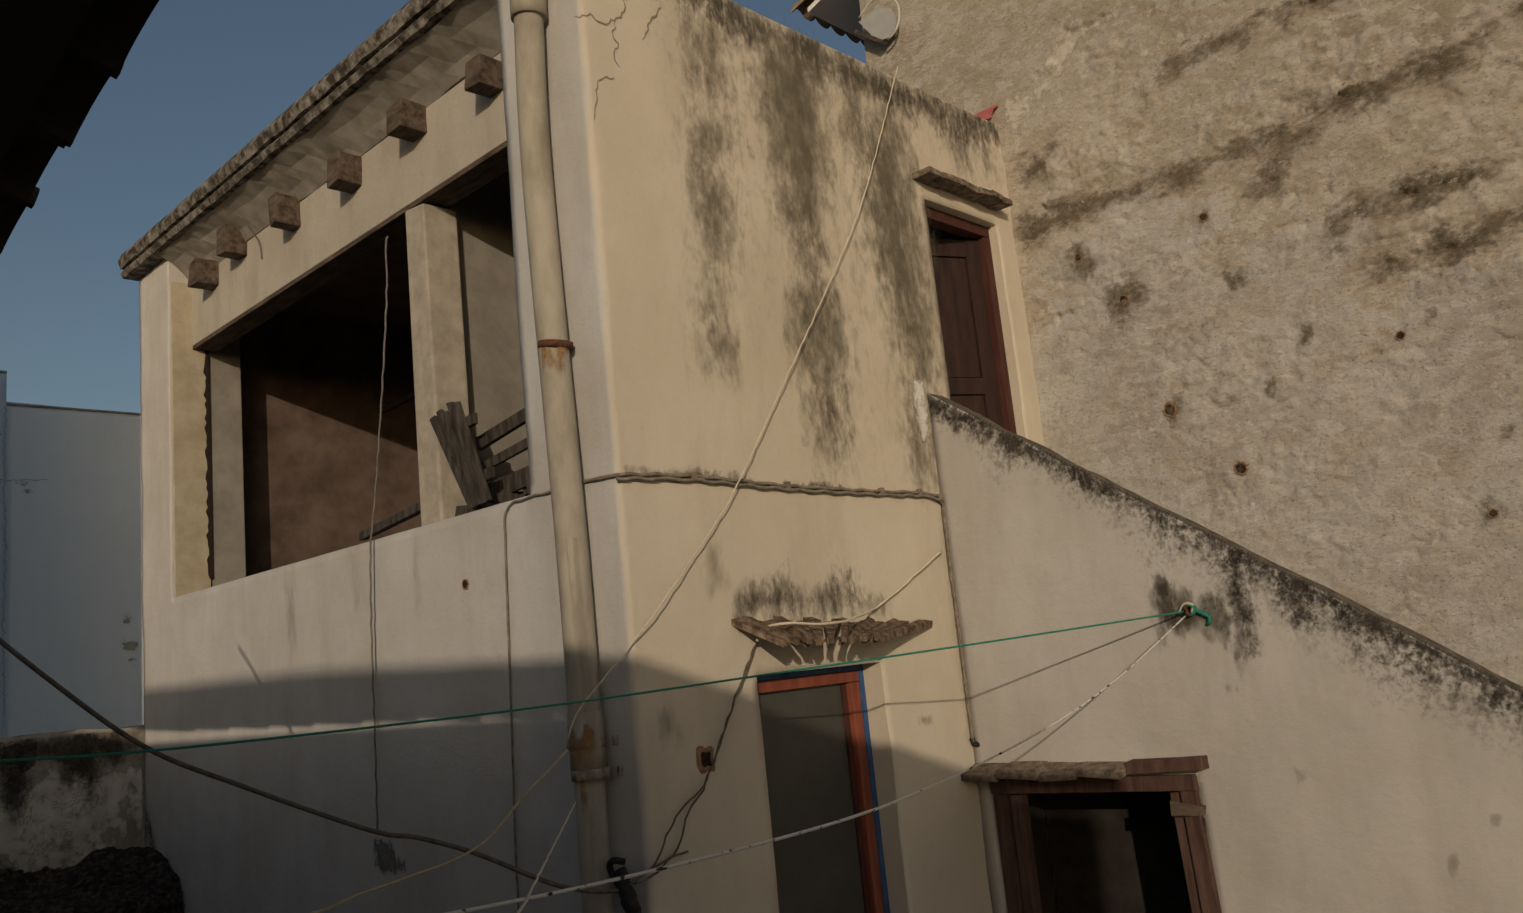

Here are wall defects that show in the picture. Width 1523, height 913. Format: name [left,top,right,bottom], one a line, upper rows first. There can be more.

crack [575,1,661,120]
damp [693,0,998,374]
mould [738,580,851,613]
mould [929,400,1523,712]